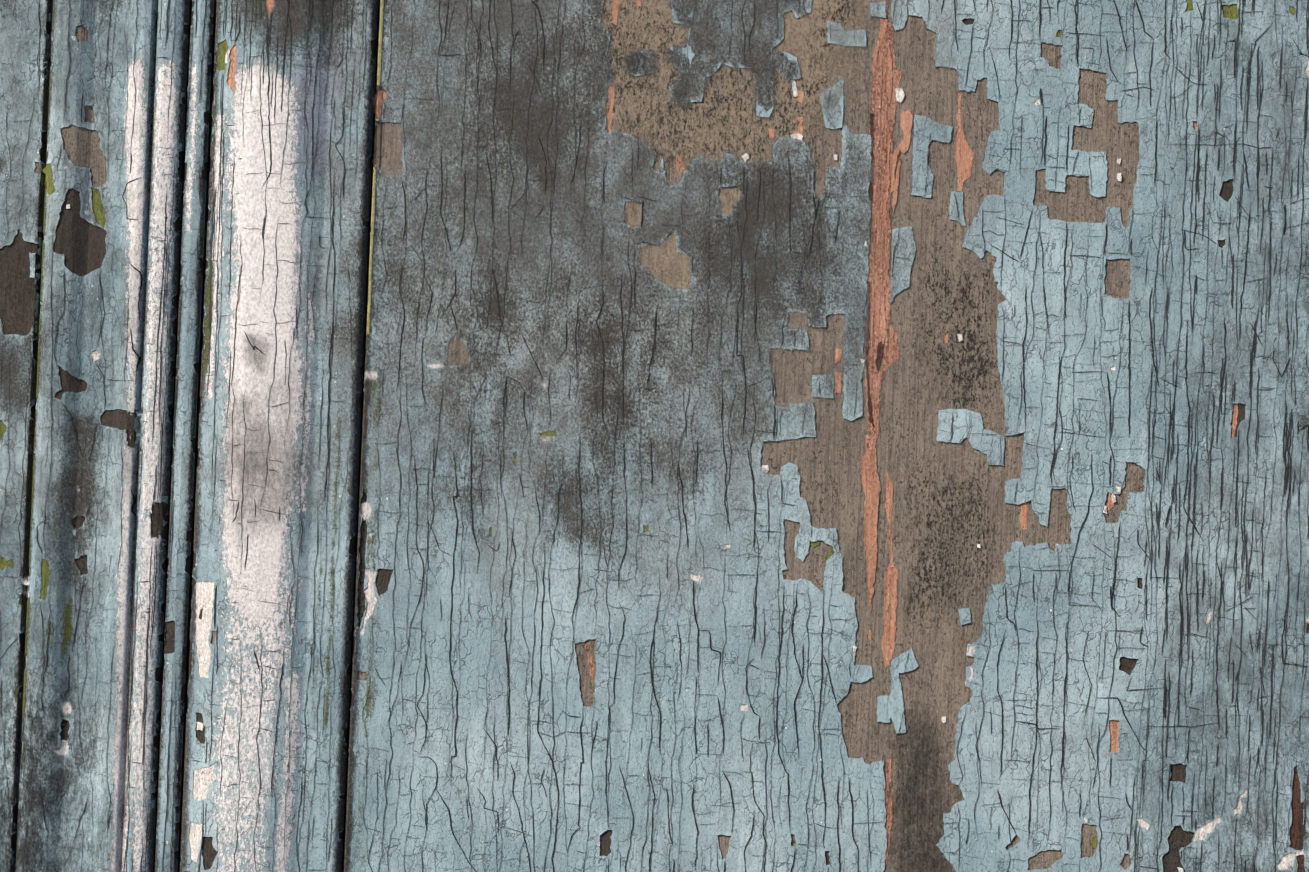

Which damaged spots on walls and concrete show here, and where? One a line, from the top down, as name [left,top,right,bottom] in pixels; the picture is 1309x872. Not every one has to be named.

peeling [0,106,107,336]
damp [329,0,872,550]
peeling [1033,68,1140,228]
peeling [1104,258,1131,299]
peeling [100,44,319,872]
peeling [600,0,1072,872]
crack [876,0,1309,872]
peeling [1102,462,1145,523]
peeling [575,639,596,707]
peeling [597,830,612,856]
peeling [1162,825,1194,872]
peeling [1289,765,1306,872]